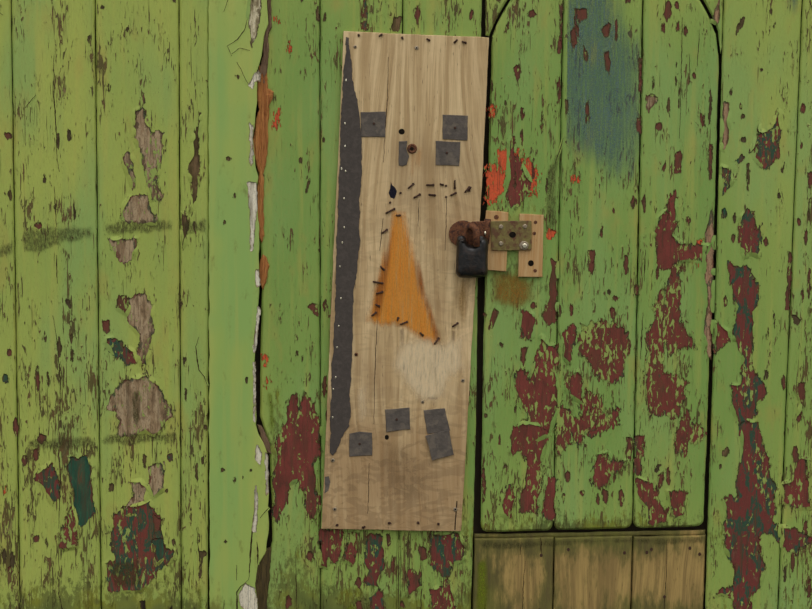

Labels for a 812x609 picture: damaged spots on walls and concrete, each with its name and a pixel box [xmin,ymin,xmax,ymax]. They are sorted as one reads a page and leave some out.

peeling [119,93,167,227]
spalling [246,0,282,252]
peeling [483,107,548,210]
peeling [700,87,785,196]
spalling [255,255,269,290]
peeling [21,433,96,552]
peeling [102,292,174,438]
peeling [102,453,178,594]
peeling [233,306,395,609]
peeling [400,531,468,609]
peeling [498,258,635,523]
peeling [580,434,689,527]